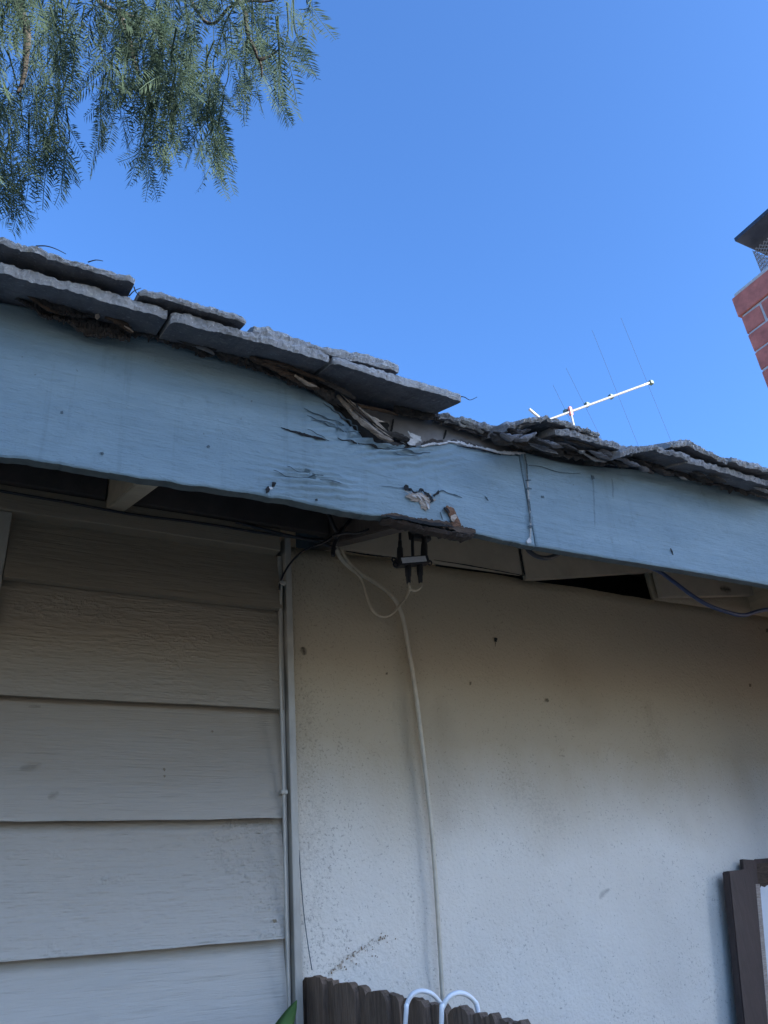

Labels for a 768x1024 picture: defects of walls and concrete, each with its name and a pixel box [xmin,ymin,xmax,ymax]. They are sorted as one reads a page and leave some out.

spalling [328,402,422,448]
peeling [385,485,462,511]